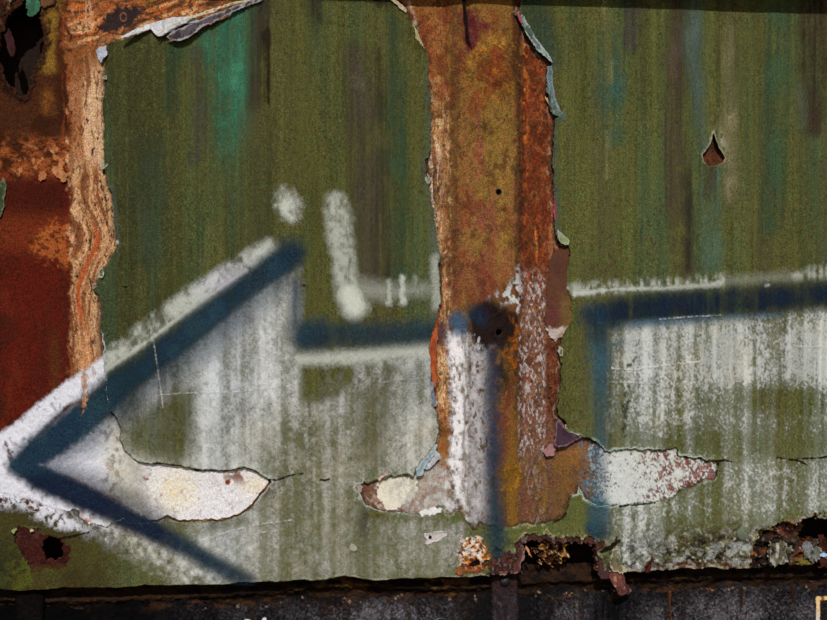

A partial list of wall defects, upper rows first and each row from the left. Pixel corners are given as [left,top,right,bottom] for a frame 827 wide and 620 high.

peeling [0,0,262,461]
peeling [355,0,718,530]
corrosion [471,301,519,378]
peeling [0,496,43,511]
peeling [96,415,272,522]
peeling [499,544,532,576]
peeling [597,549,631,595]